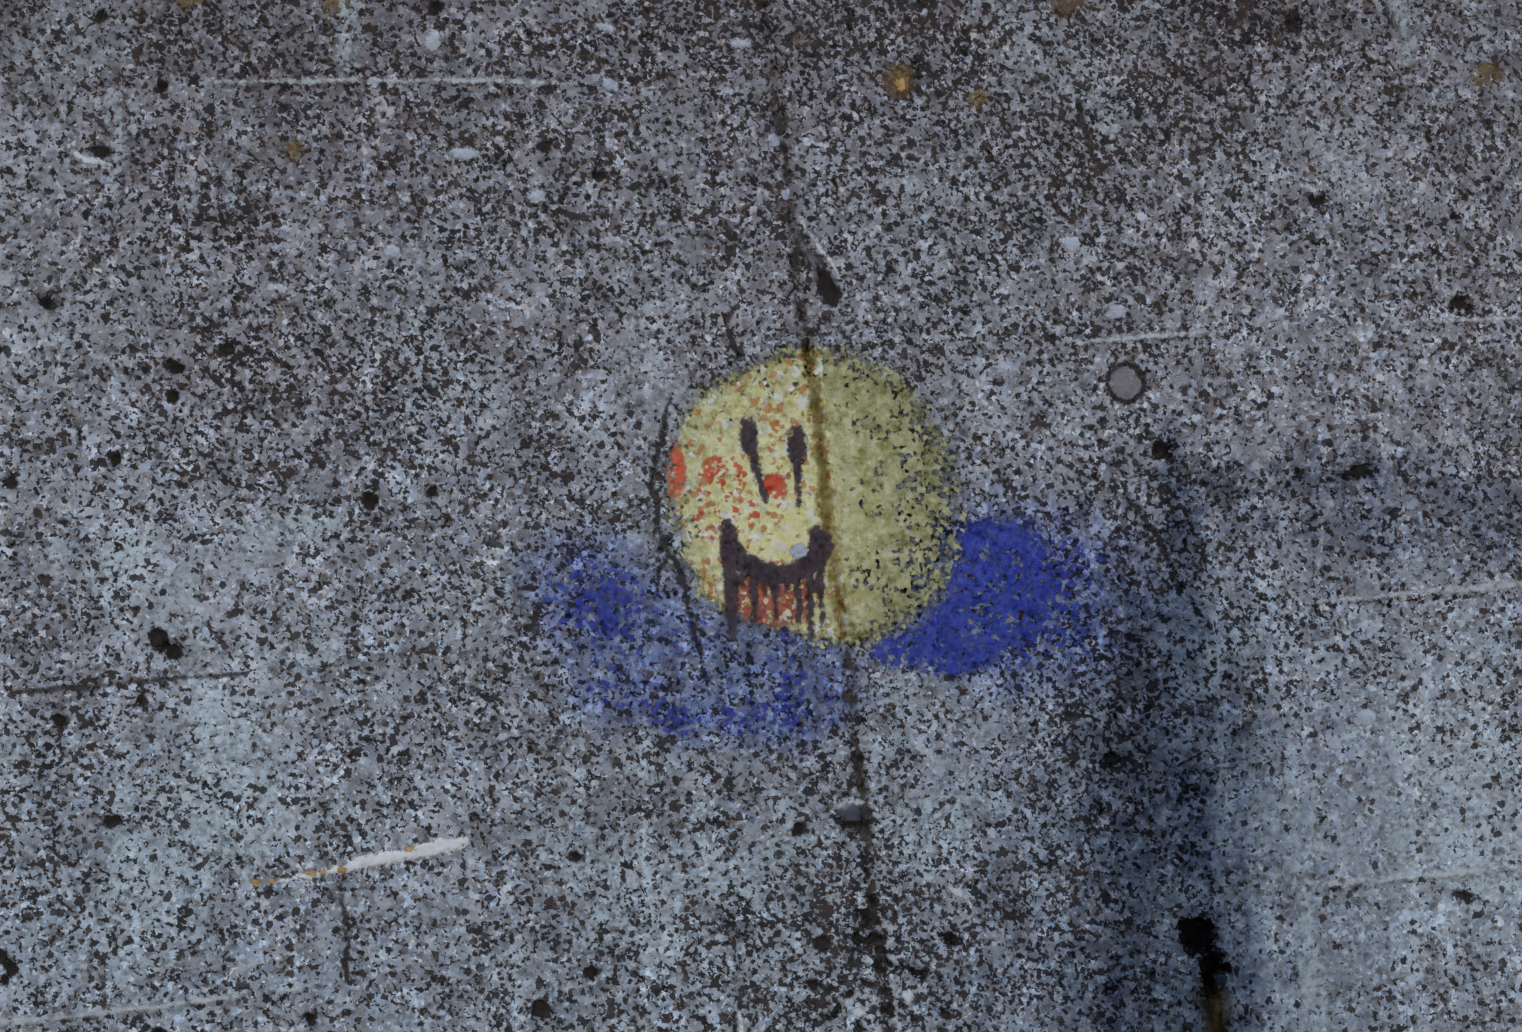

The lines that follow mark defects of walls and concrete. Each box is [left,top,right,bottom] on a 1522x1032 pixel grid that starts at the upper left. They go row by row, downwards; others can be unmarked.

crack [763,6,809,388]
crack [835,624,909,1032]
rust [1175,913,1234,1032]